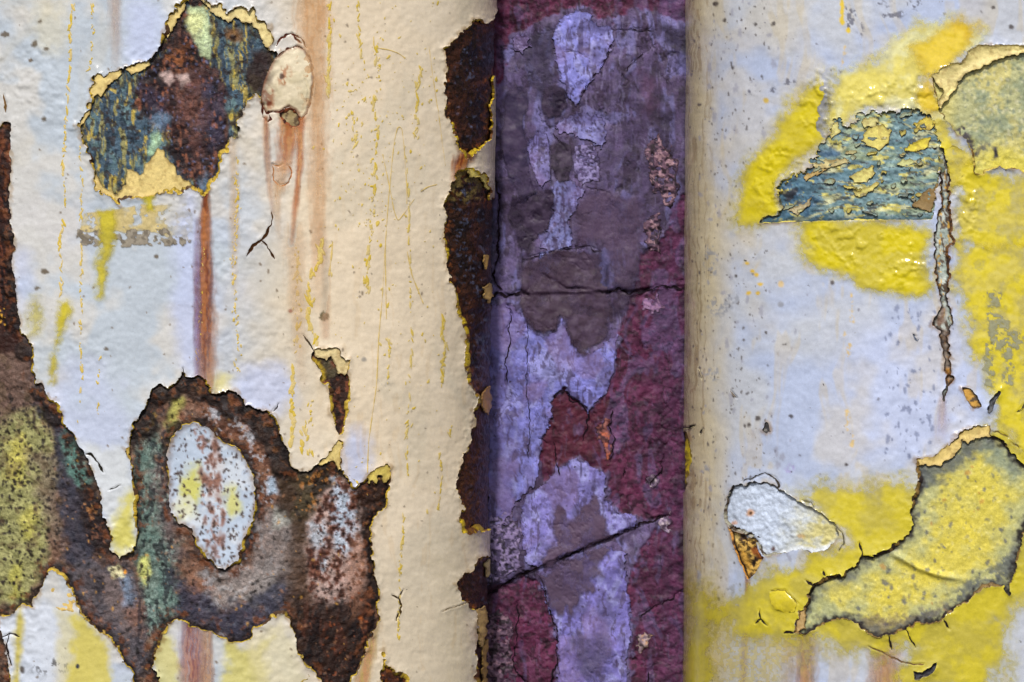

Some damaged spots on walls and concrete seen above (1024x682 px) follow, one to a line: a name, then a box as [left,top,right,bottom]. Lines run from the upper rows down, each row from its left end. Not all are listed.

peeling [77,0,278,205]
rust [264,0,325,212]
rust [454,152,472,174]
peeling [760,44,1024,223]
peeling [0,122,391,682]
crack [491,179,601,476]
peeling [443,10,654,682]
crack [608,285,685,295]
crack [442,515,665,682]
peeling [724,481,839,579]
peeling [794,387,1024,638]